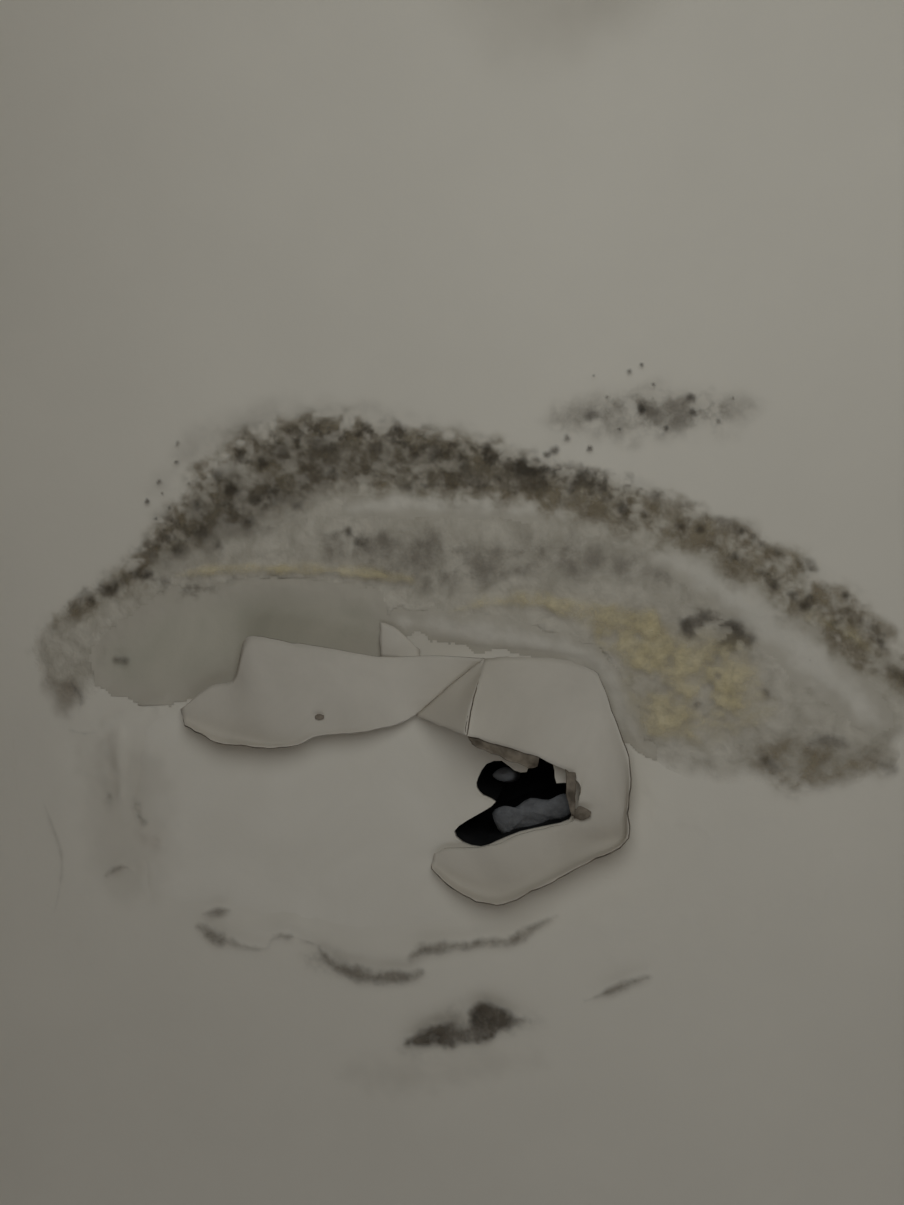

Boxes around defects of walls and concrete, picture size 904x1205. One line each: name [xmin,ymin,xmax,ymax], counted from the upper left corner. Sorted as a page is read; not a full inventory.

water stain [114,416,387,590]
water stain [395,428,659,526]
water stain [664,511,801,591]
water stain [89,566,407,707]
spalling [32,423,904,928]
water stain [519,595,752,735]
water stain [790,584,881,668]
mould [406,1003,517,1047]